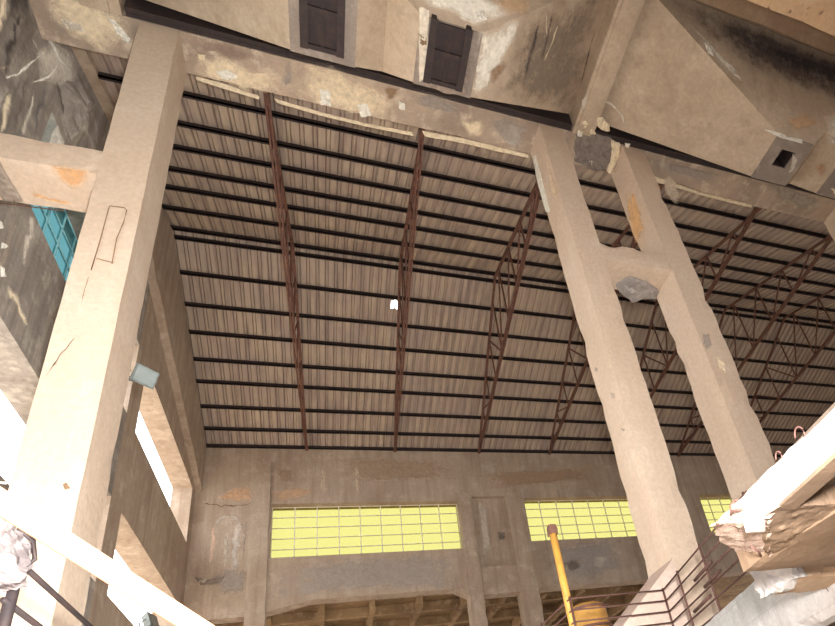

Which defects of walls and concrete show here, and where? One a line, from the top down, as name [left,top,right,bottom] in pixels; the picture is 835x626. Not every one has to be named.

leakage [0,0,72,134]
peeling [56,0,130,46]
leakage [433,0,525,22]
leakage [477,25,515,87]
leakage [510,1,595,105]
leakage [722,24,835,91]
spalling [574,117,630,174]
spalling [616,276,659,303]
spalling [709,483,835,558]